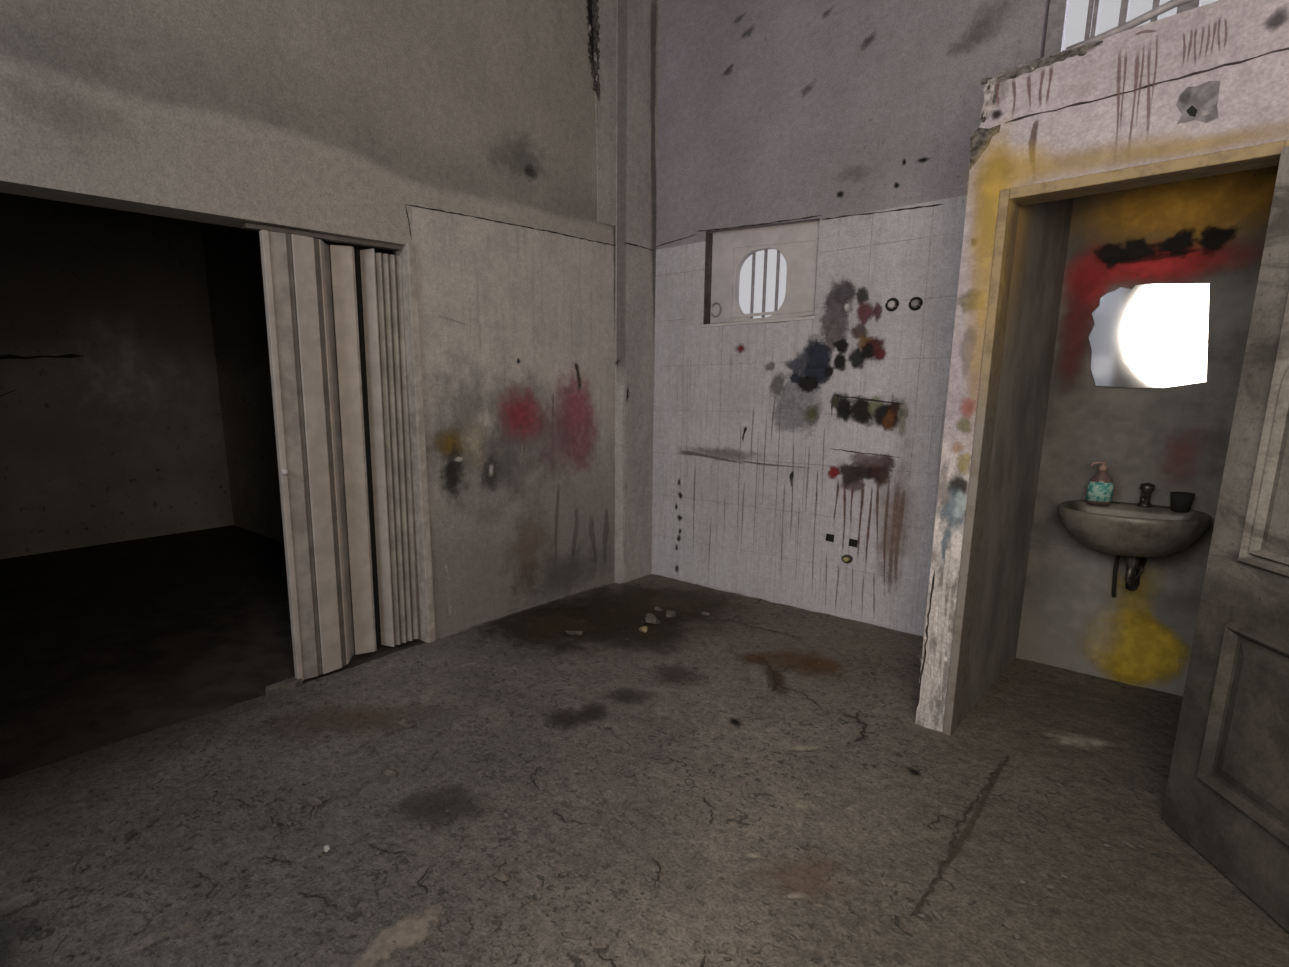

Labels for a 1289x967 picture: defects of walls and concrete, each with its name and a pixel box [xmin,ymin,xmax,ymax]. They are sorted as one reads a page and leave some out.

spalling [969,40,1103,171]
peeling [1176,81,1220,124]
leakage [505,589,727,649]
leakage [551,690,641,726]
crack [910,756,1009,916]